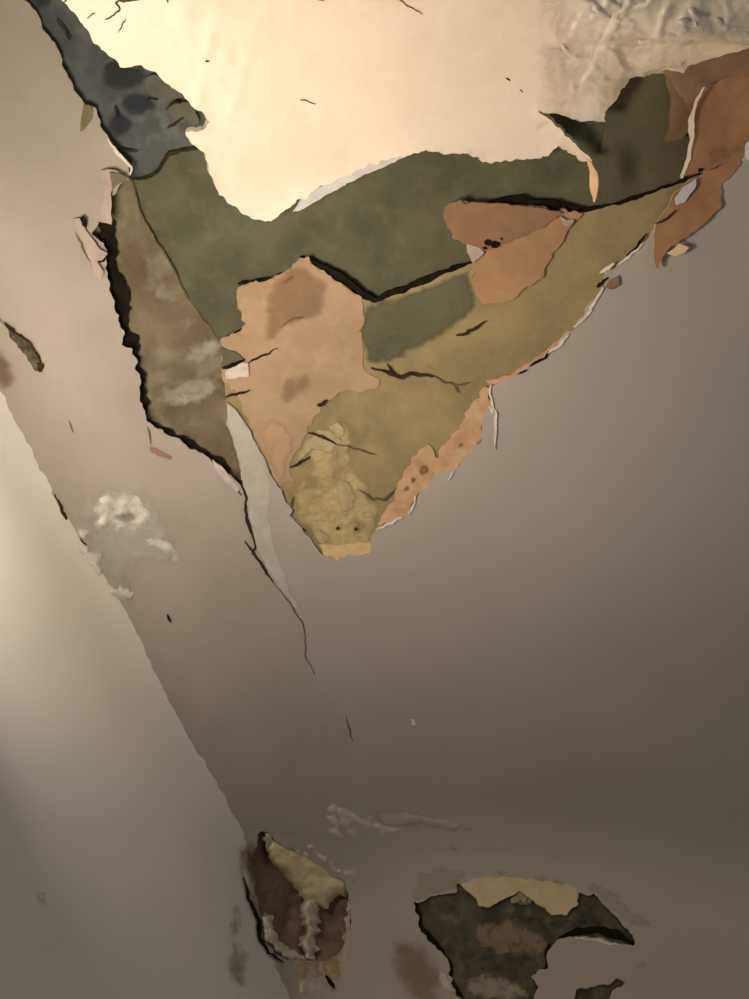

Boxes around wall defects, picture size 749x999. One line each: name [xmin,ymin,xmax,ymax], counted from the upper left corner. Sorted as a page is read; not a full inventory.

crack [87,0,138,33]
peeling [25,0,723,618]
peeling [4,322,44,372]
efflorescence [94,493,150,529]
efflorescence [148,539,173,552]
crack [227,473,314,672]
peeling [326,803,460,838]
flaking render [243,831,358,994]
flaking render [413,867,648,999]